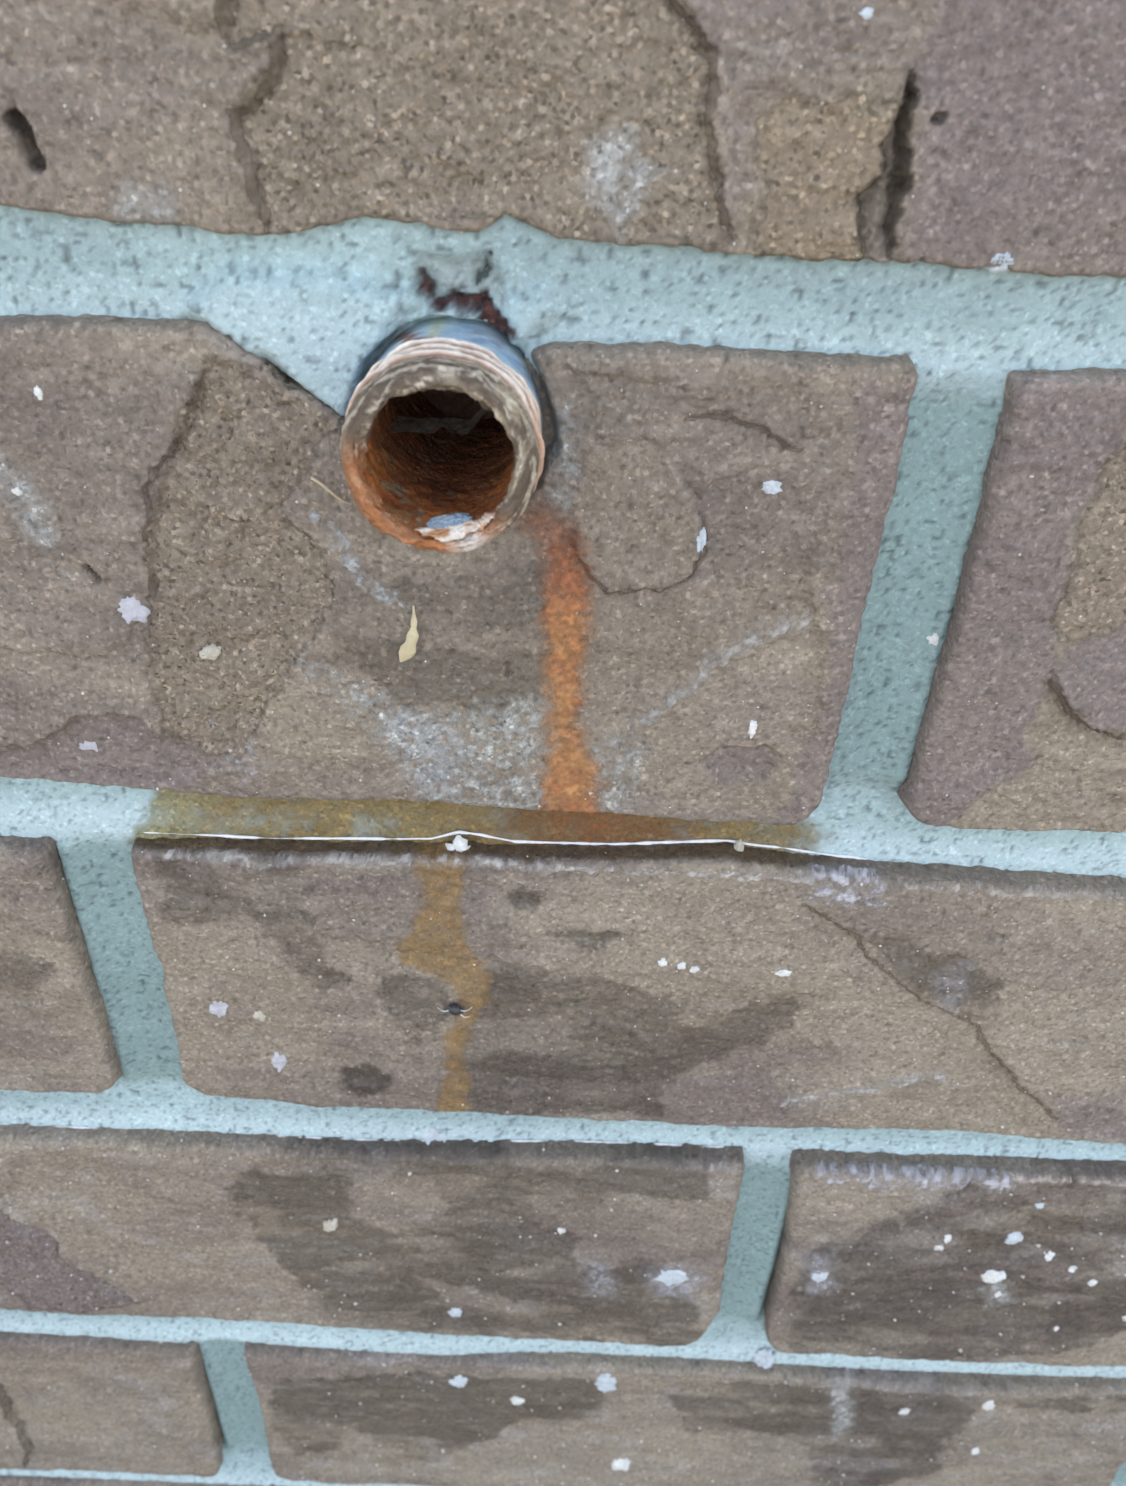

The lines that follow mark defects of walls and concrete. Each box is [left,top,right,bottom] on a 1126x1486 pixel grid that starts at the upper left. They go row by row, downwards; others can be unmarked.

crack [214,0,287,234]
crack [670,0,736,240]
crack [855,68,918,262]
spalling [1052,447,1126,642]
corrosion [132,541,828,1112]
water stain [144,830,886,990]
crack [802,903,1060,1120]
water stain [232,1138,737,1347]
water stain [790,1162,1126,1360]
crack [0,1383,34,1468]
water stain [270,1362,603,1448]
water stain [672,1377,973,1486]